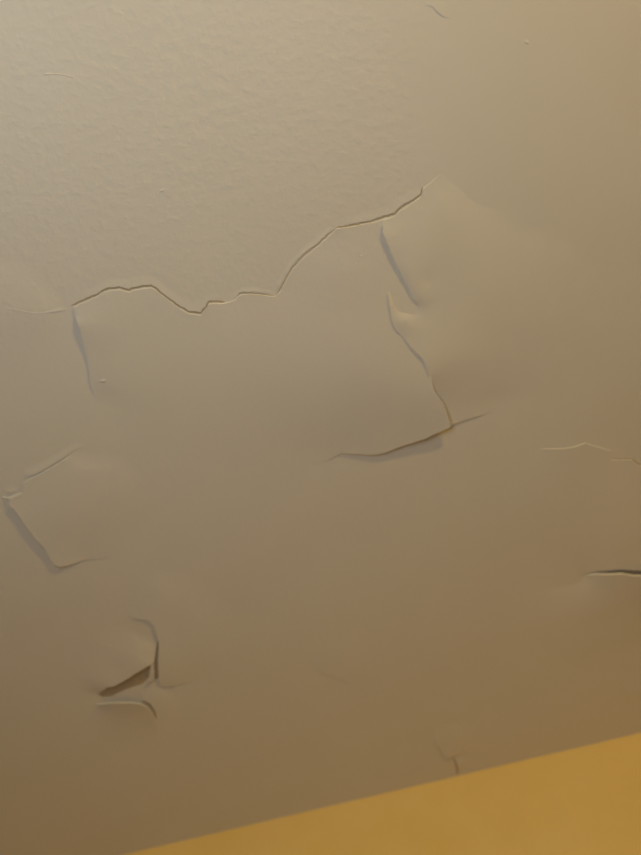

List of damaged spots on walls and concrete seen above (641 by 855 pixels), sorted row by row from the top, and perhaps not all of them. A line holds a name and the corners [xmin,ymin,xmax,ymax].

peeling [499,443,641,670]